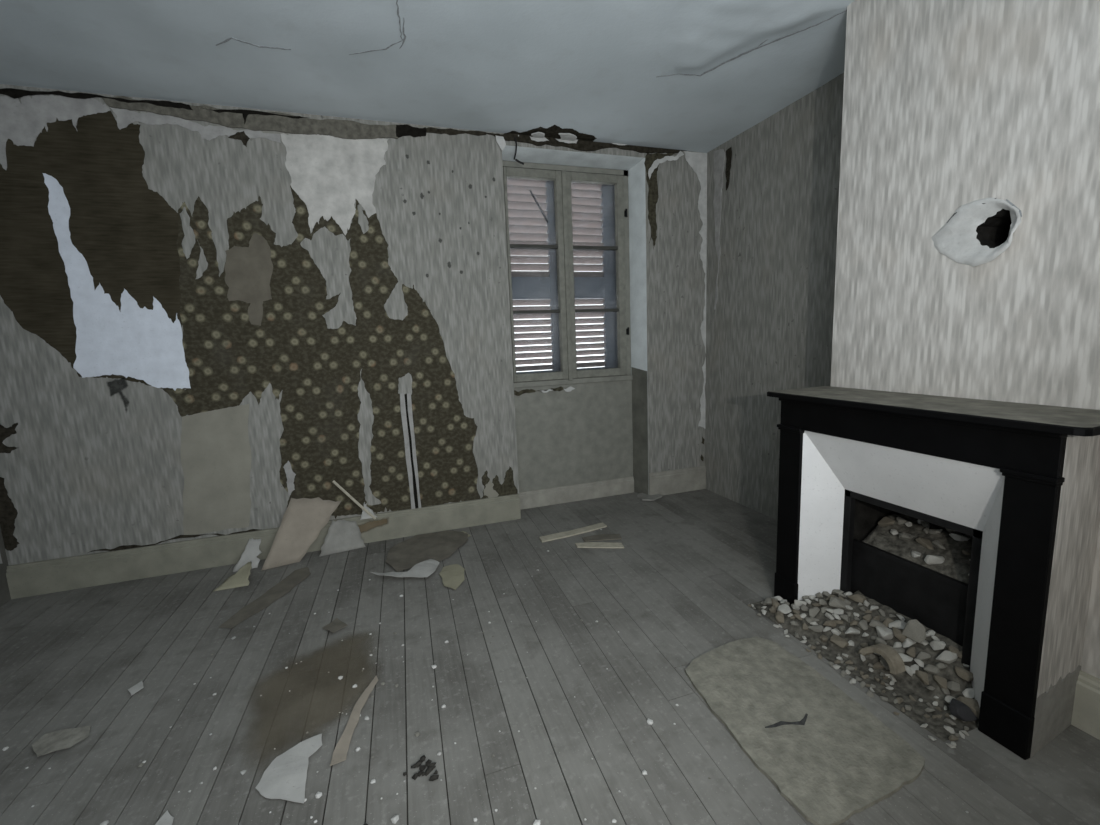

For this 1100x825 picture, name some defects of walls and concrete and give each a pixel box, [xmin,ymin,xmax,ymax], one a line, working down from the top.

crack [216,37,291,50]
crack [349,0,406,55]
spalling [495,125,597,152]
flaking render [0,88,427,329]
flaking render [43,173,191,390]
peeling [398,373,412,394]
peeling [357,369,381,505]
peeling [283,461,296,497]
peeling [484,481,499,498]